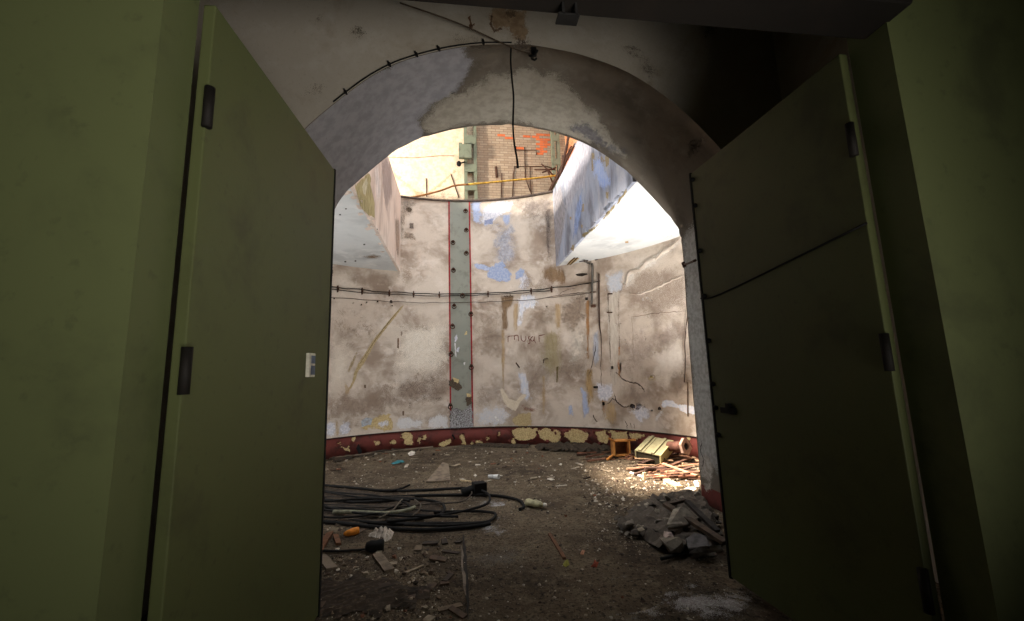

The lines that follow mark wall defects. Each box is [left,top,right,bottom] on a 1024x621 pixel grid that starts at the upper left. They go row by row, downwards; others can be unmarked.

peeling [415,57,628,277]
peeling [474,259,531,290]
rust [500,295,518,386]
peeling [336,370,646,470]